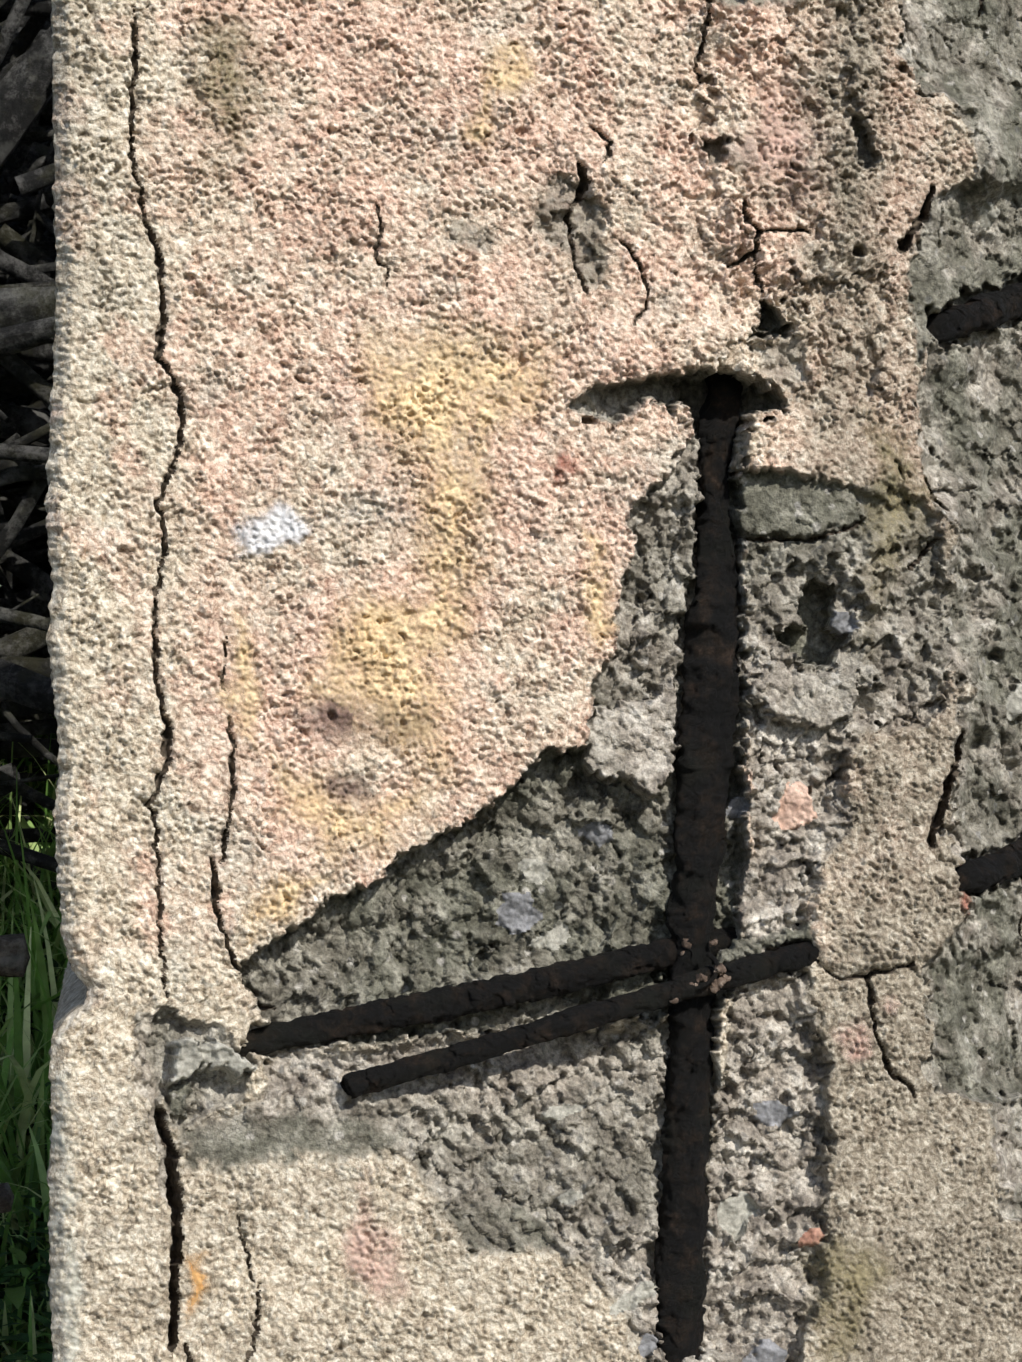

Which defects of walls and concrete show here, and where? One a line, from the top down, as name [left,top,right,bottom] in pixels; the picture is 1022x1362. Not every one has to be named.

crack [563,128,613,294]
crack [620,241,650,326]
crack [693,0,713,83]
crack [727,200,811,293]
crack [128,6,186,998]
spalling [236,0,1022,1026]
crack [210,636,276,1011]
crack [154,1107,193,1362]
spalling [135,967,671,1362]
spalling [699,966,837,1362]
crack [825,961,916,1098]
spalling [920,877,1022,1223]